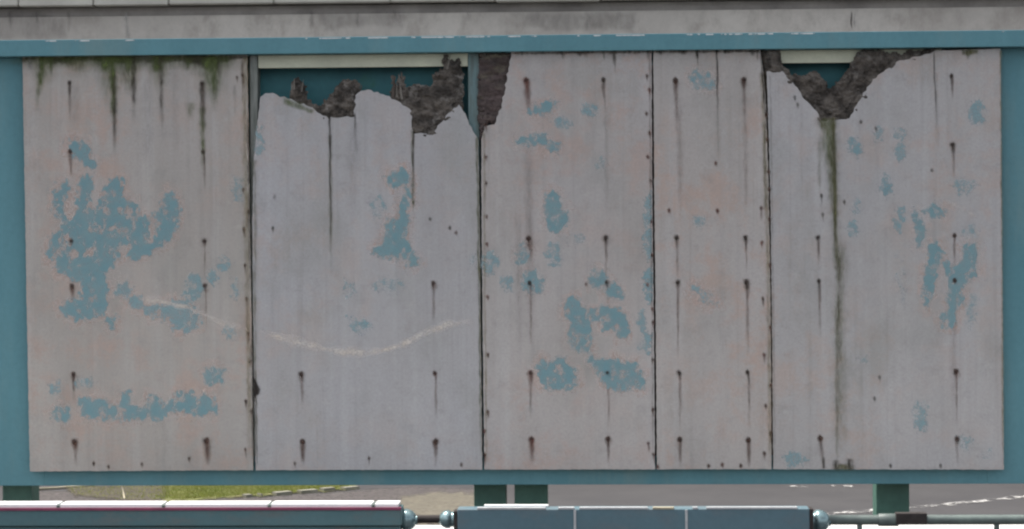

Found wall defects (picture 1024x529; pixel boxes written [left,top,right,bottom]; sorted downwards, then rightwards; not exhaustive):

damp [102,56,116,130]
peeling [42,133,238,336]
peeling [370,163,424,268]
peeling [481,190,569,294]
peeling [534,190,653,392]
damp [821,120,837,227]
peeling [892,203,978,329]
peeling [50,366,226,425]